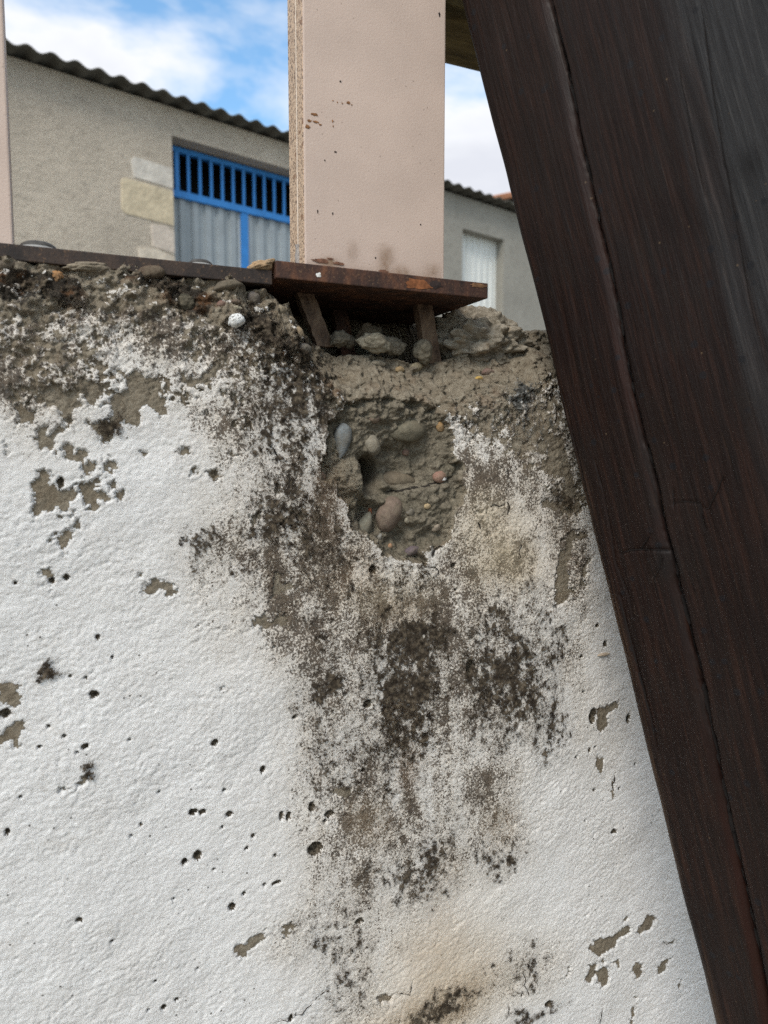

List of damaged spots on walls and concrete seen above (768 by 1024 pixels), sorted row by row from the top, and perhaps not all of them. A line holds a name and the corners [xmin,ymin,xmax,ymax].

rust [406,278,443,289]
damp [93,412,133,441]
peeling [15,369,167,550]
spalling [321,397,464,574]
peeling [139,573,178,597]
peeling [554,529,589,605]
damp [178,298,582,1024]
peeling [0,683,25,748]
peeling [589,701,630,732]
peeling [234,928,266,957]
peeling [584,915,655,987]